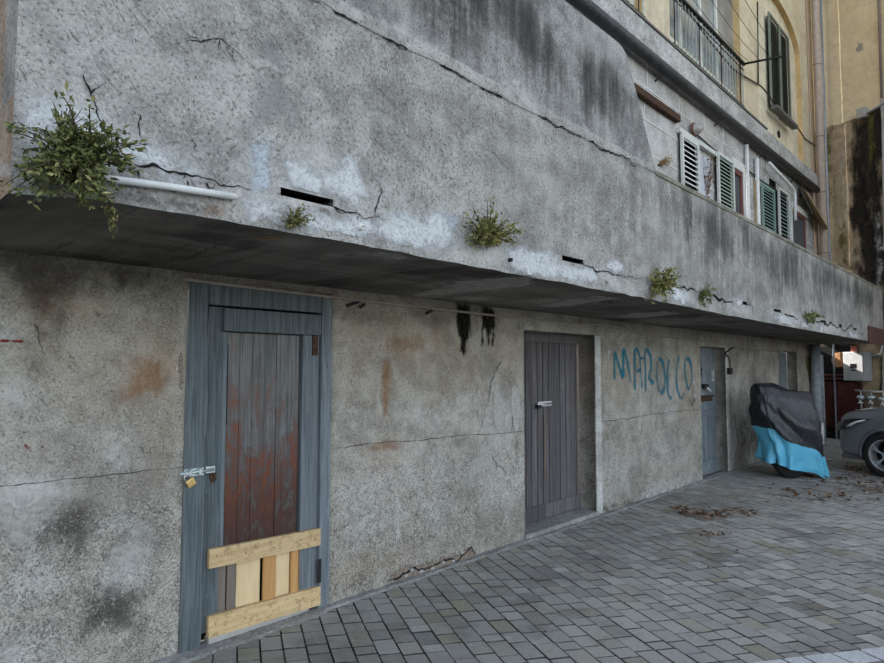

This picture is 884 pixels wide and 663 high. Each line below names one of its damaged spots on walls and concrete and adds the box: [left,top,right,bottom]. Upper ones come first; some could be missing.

crack [83,74,116,142]
crack [135,114,251,190]
damp [814,107,884,317]
damp [403,247,597,354]
damp [607,258,623,274]
crack [680,286,753,313]
crack [784,313,864,333]
crack [334,363,523,488]
crack [0,467,179,487]
spalling [388,547,476,582]